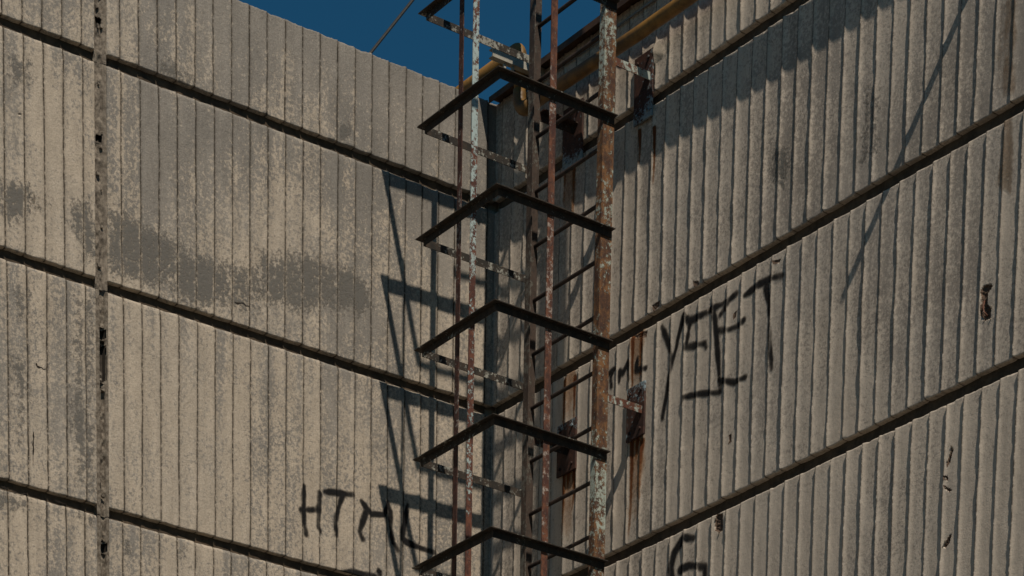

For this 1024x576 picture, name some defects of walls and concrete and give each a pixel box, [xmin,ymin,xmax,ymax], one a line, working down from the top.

water stain [70,197,374,318]
spalling [980,284,993,322]
rust [631,331,643,387]
rust [563,374,577,423]
rust [562,470,576,522]
rust [629,438,645,526]